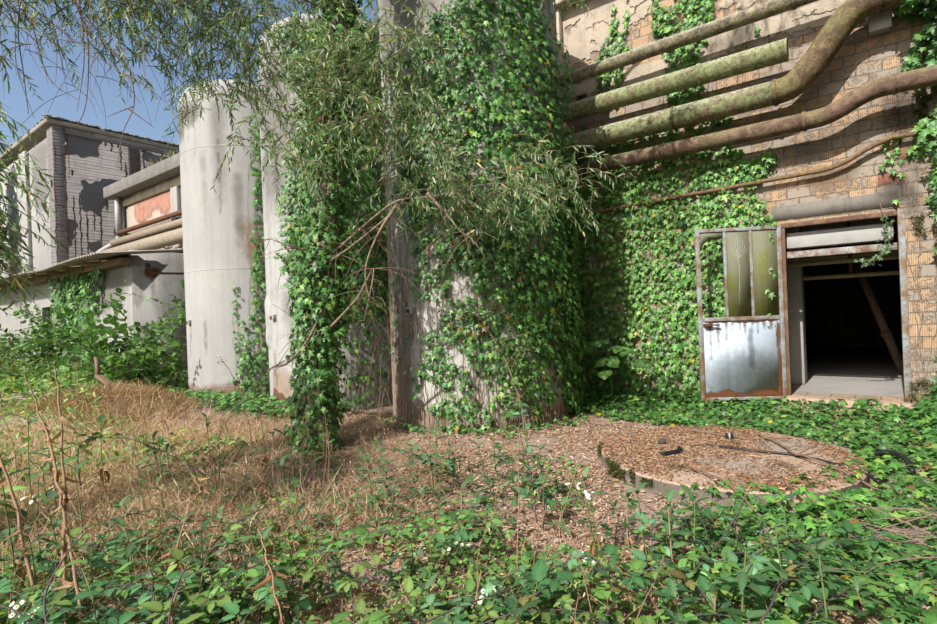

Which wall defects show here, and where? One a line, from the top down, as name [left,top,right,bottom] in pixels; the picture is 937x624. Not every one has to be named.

peeling [562,0,846,103]
spalling [53,127,109,261]
spalling [104,142,145,178]
peeling [135,190,171,223]
corrosion [705,319,782,398]